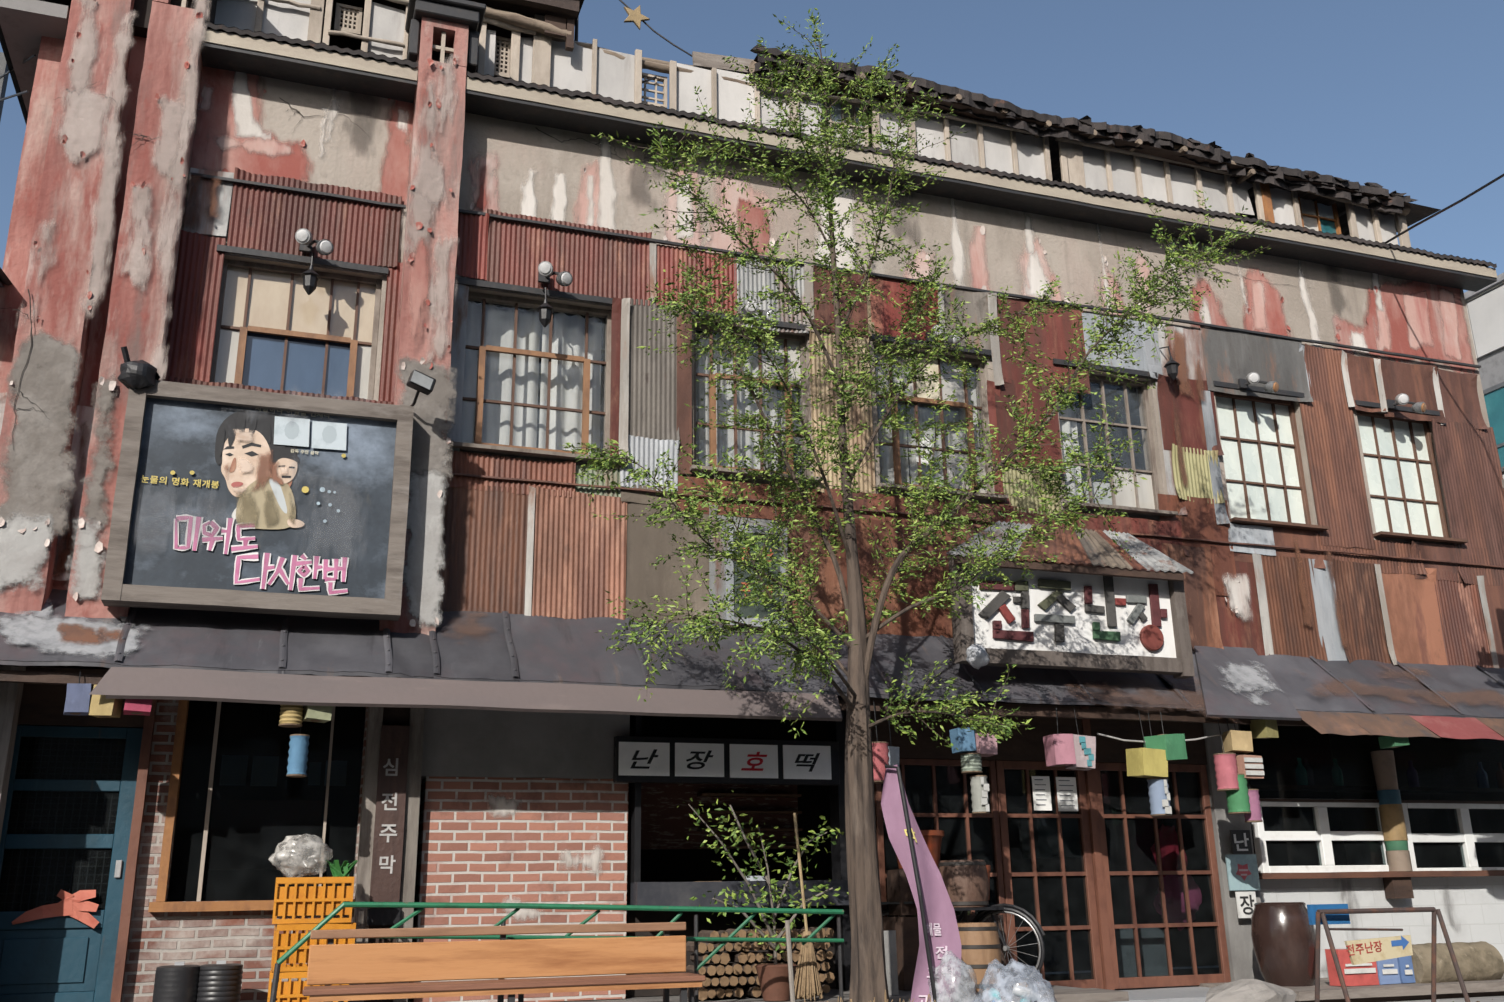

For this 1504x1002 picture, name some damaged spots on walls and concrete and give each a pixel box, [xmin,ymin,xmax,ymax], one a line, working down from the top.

peeling [60,0,311,315]
crack [279,97,363,130]
spalling [152,344,167,379]
peeling [381,57,457,370]
peeling [663,158,775,258]
peeling [815,177,856,270]
peeling [904,250,931,281]
peeling [1020,238,1070,303]
peeling [1189,269,1291,337]
peeling [1333,281,1476,374]
rust [1168,331,1205,486]
rust [1327,549,1348,647]